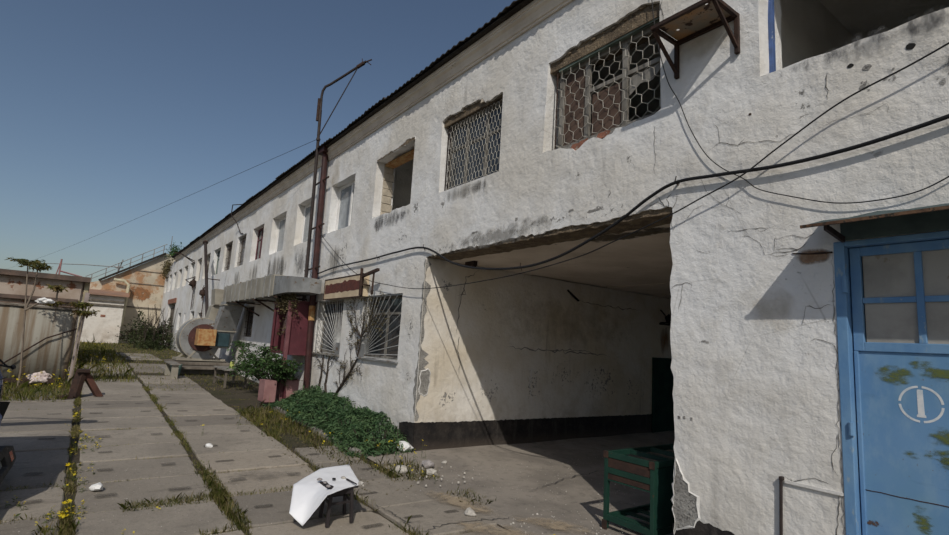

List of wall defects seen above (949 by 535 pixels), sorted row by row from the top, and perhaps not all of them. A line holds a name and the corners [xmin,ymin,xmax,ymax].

leakage [452,218,545,246]
crack [613,180,816,256]
rust [800,205,949,229]
crack [456,271,477,367]
spalling [406,204,673,421]
flaking render [671,458,700,534]